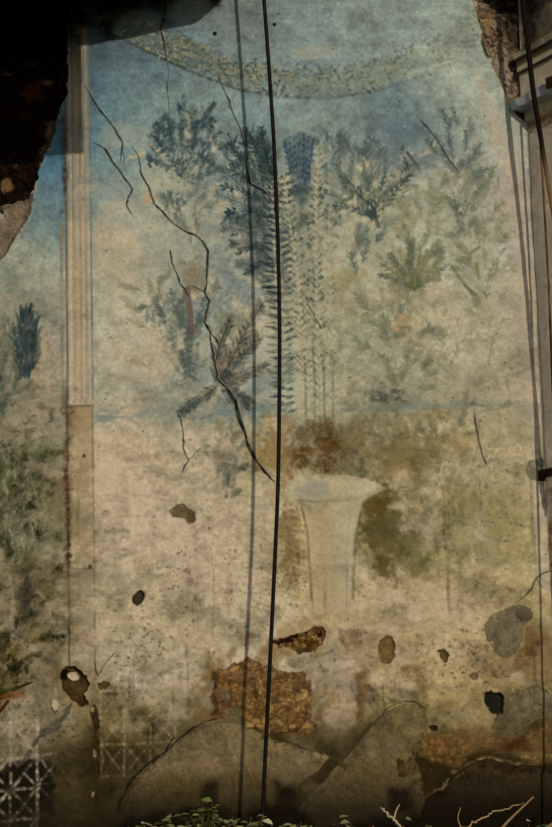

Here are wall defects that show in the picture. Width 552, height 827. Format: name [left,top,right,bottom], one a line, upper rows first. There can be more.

crack [160,1,172,117]
flaking render [473,0,524,121]
flaking render [0,2,69,259]
crack [84,74,275,482]
spalling [273,627,326,654]
flaking render [60,666,110,777]
crack [117,719,215,815]
leakage [122,782,312,827]
crack [279,701,426,765]
leakage [339,789,419,827]
flaking render [416,757,552,827]
leakage [422,722,552,765]